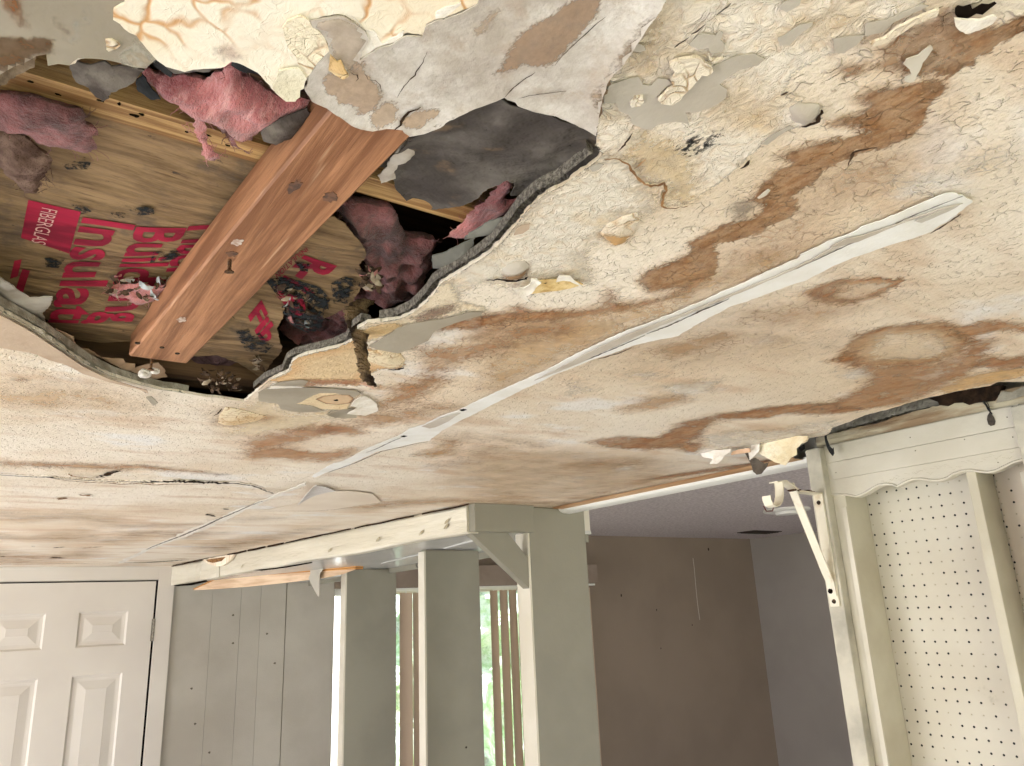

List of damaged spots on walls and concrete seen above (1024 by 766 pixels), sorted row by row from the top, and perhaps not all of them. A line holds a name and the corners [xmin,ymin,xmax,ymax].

peeling [954,14,997,34]
crack [604,134,688,209]
peeling [232,0,939,434]
damp [236,15,1024,462]
crack [896,196,963,234]
crack [486,275,528,283]
peeling [0,296,189,406]
crack [585,299,728,361]
damp [654,460,772,480]
peeling [701,449,731,464]
peeling [745,436,808,475]
crack [0,470,469,567]